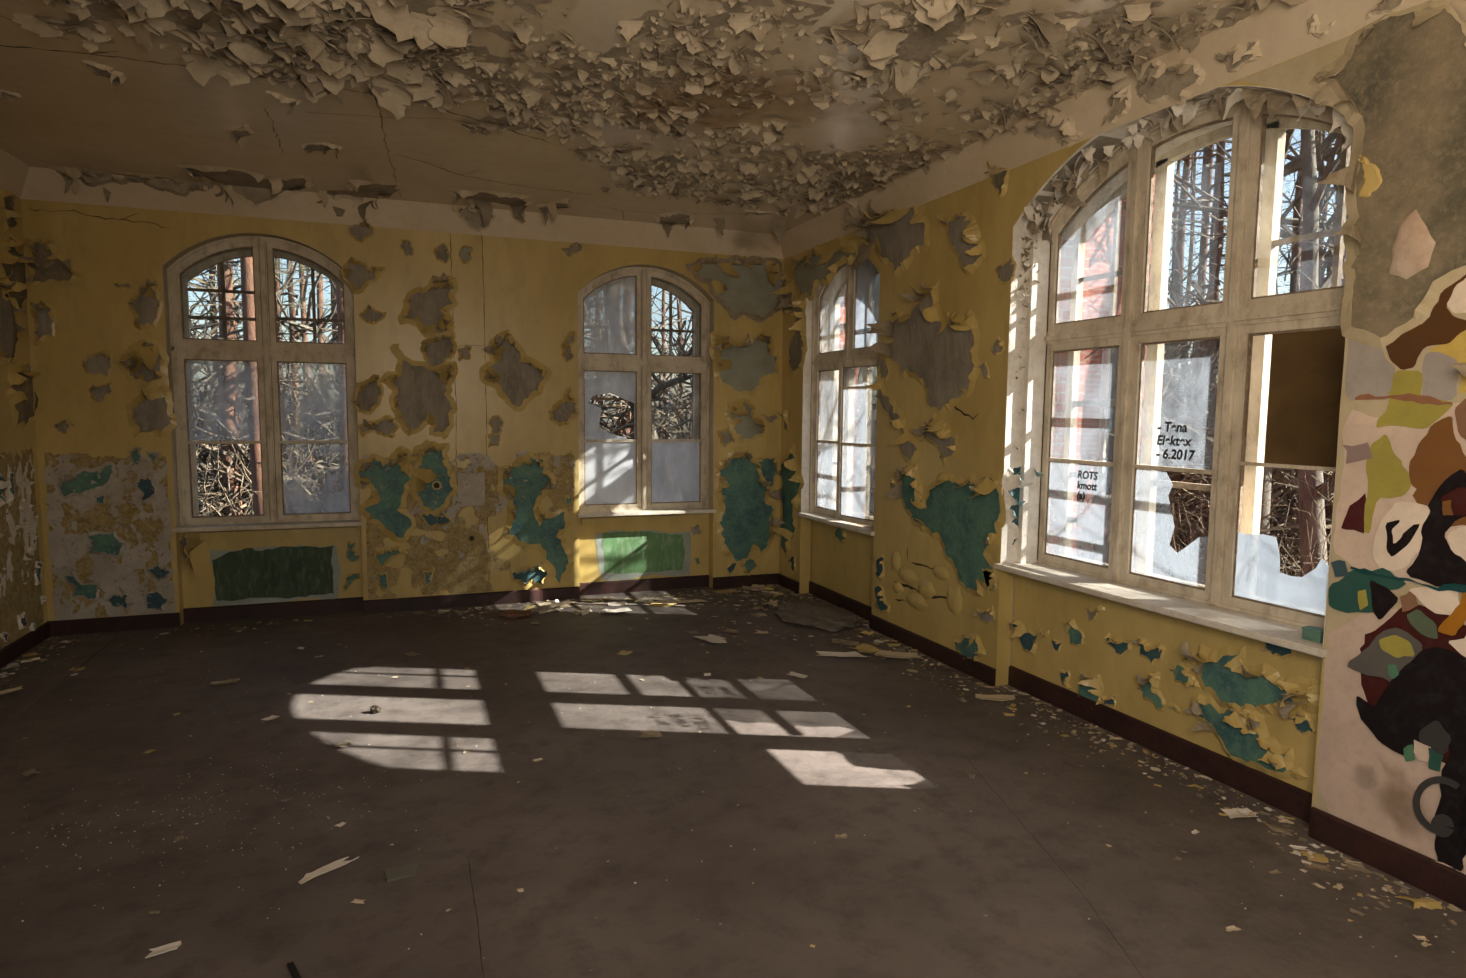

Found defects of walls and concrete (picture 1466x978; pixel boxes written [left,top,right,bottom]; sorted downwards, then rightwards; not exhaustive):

flaking render [0,0,1466,781]